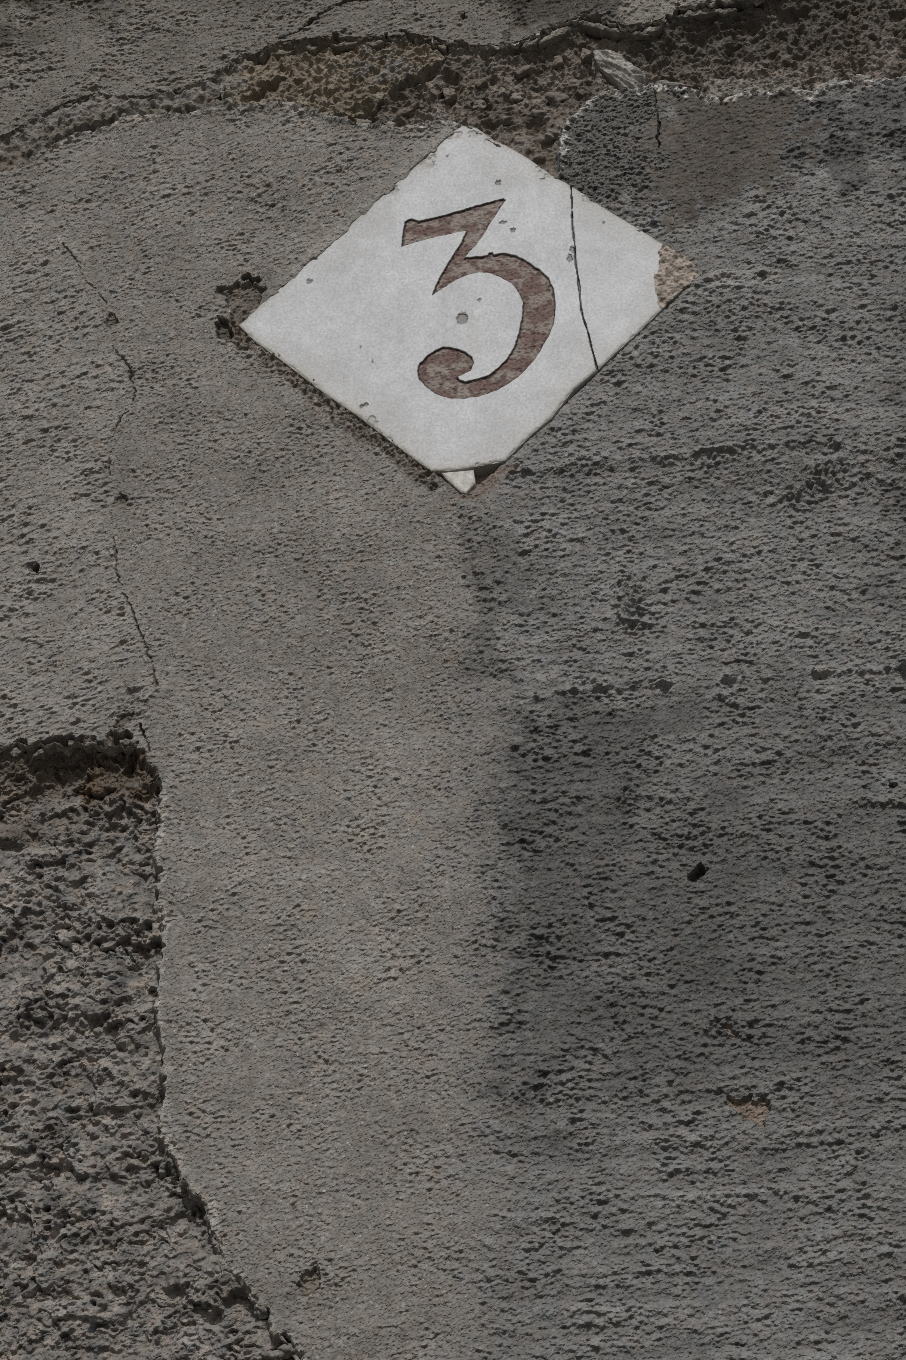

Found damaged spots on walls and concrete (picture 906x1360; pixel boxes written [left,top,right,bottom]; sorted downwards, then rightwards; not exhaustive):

spalling [52,0,906,178]
crack [571,196,600,373]
crack [62,241,159,687]
crack [139,722,151,752]
spalling [0,729,304,1360]
spalling [296,1265,322,1298]